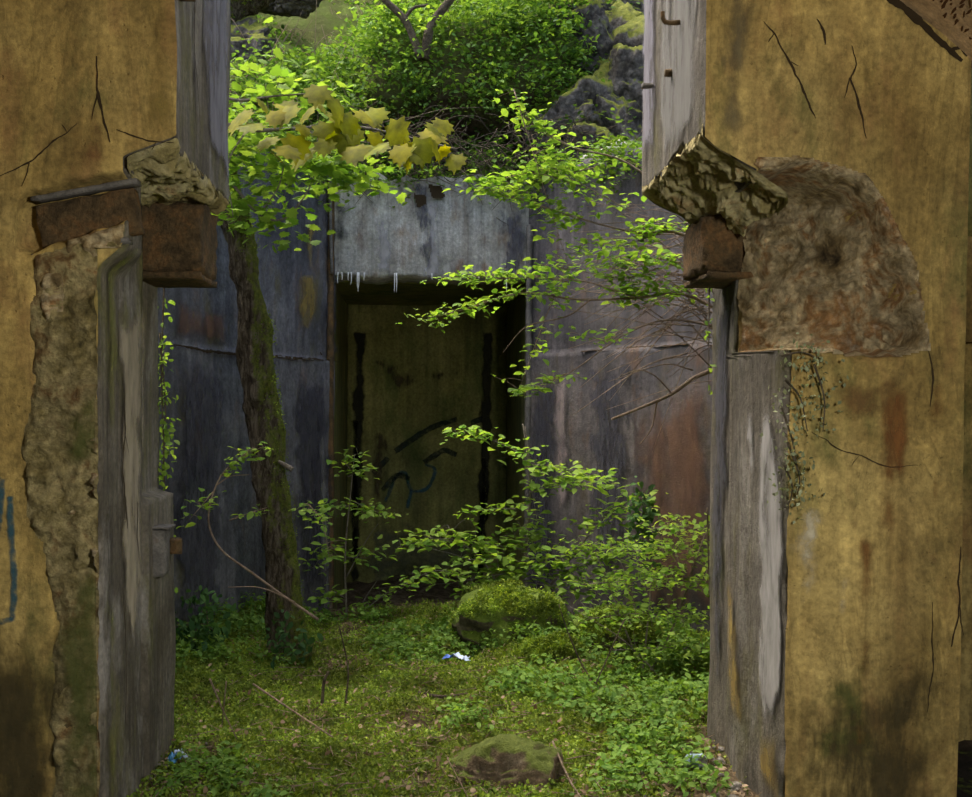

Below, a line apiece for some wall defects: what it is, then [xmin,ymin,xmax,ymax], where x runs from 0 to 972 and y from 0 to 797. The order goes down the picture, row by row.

crack [0,2,201,185]
crack [764,22,816,118]
crack [817,19,826,45]
crack [844,46,867,138]
crack [887,0,967,62]
spalling [642,124,931,357]
spalling [21,224,125,797]
damp [351,332,493,582]
rust [642,399,707,595]
damp [747,418,782,713]
crack [927,547,964,712]
damp [0,666,60,797]